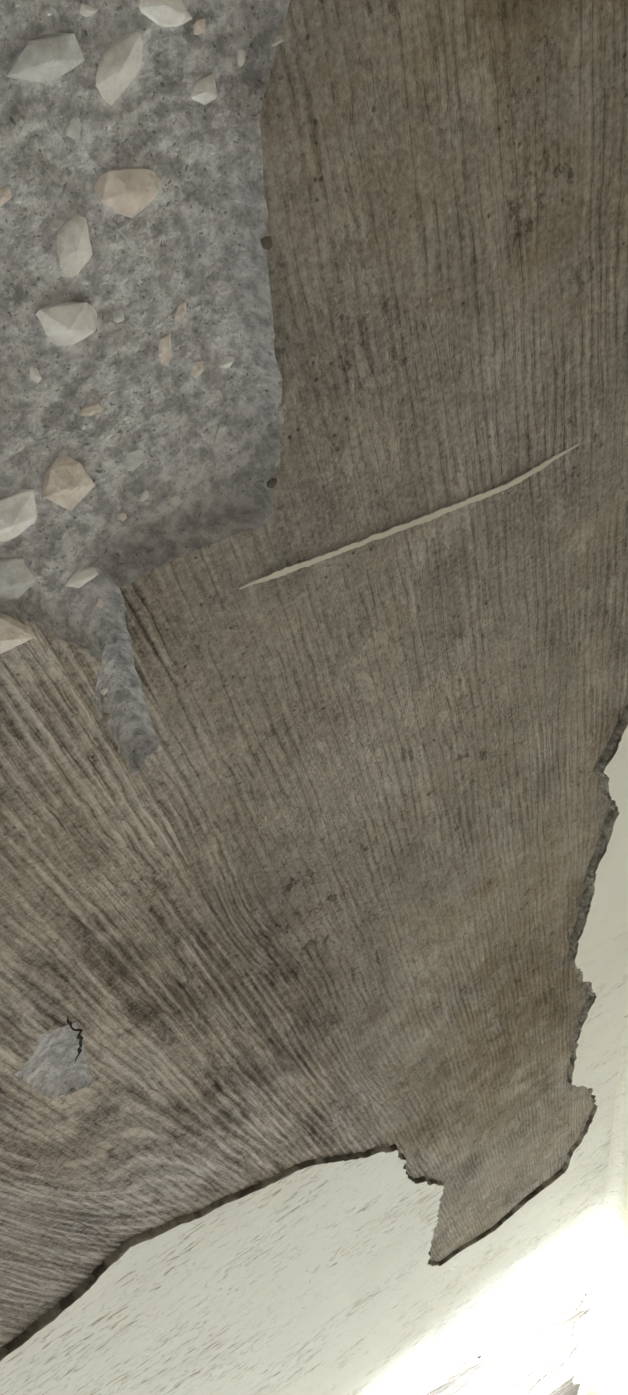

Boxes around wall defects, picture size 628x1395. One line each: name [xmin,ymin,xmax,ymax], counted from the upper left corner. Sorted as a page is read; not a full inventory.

spalling [0,0,290,776]
peeling [567,704,628,982]
spalling [14,1025,94,1099]
peeling [567,981,597,1085]
peeling [0,1144,398,1361]
peeling [406,1171,444,1186]
peeling [428,1095,598,1266]
peeling [548,1375,580,1395]